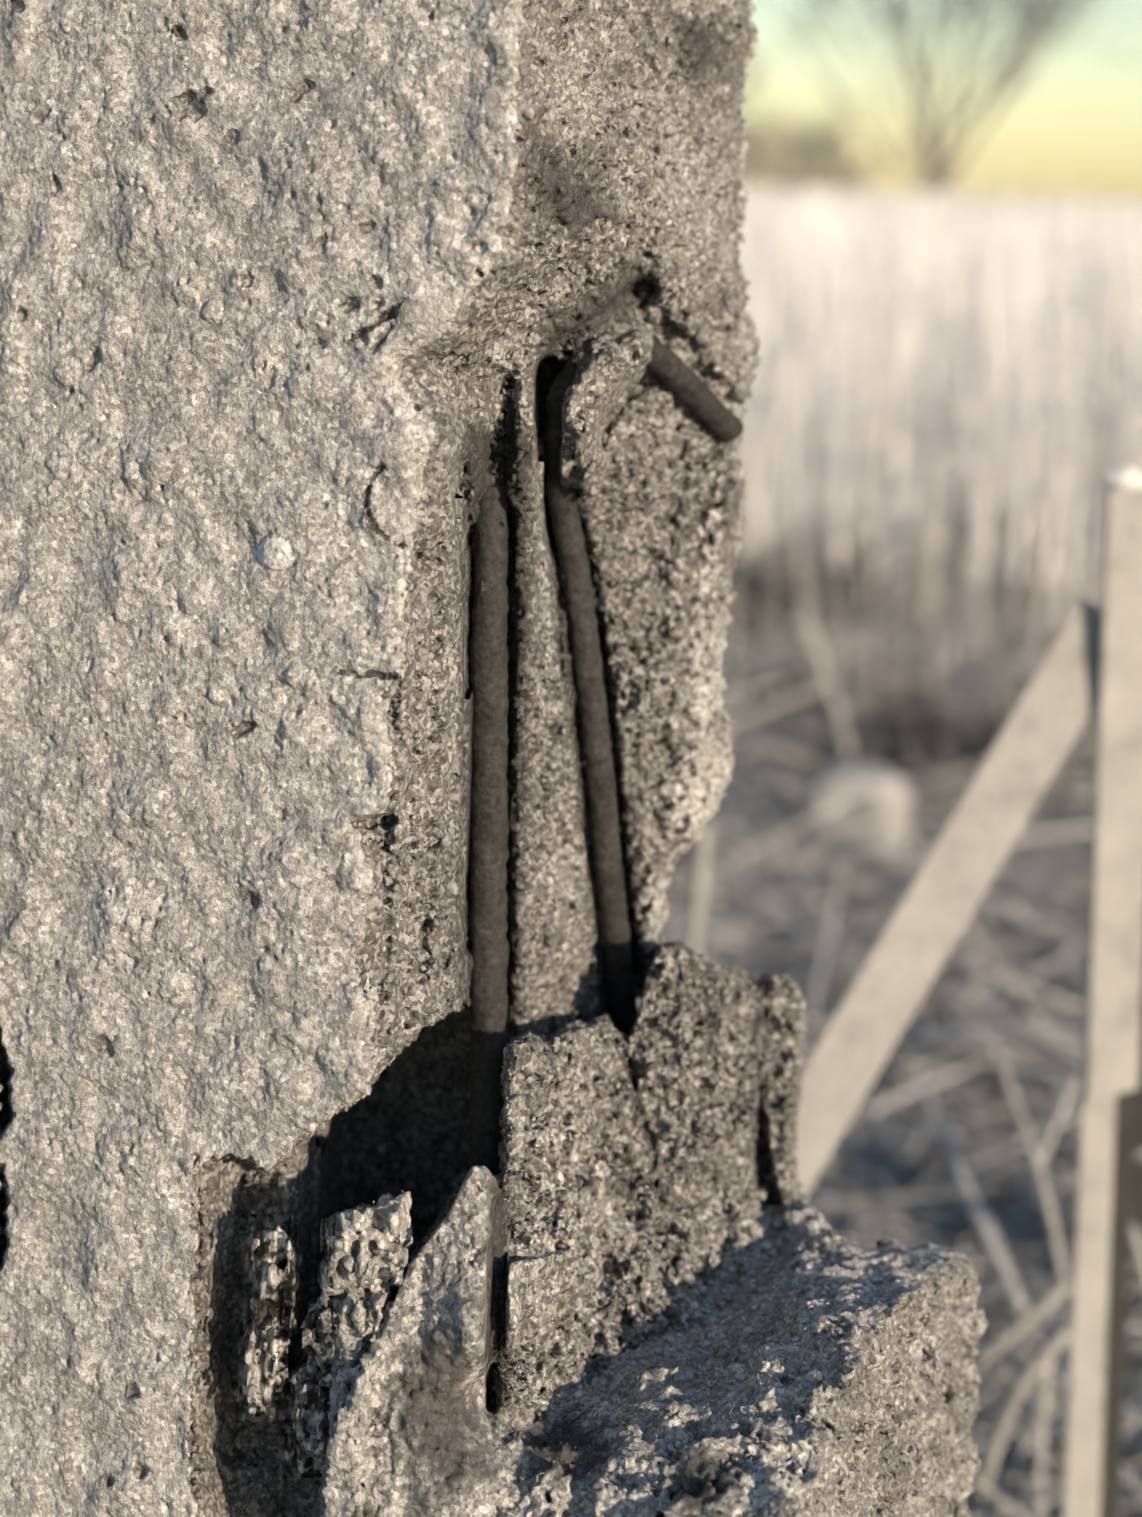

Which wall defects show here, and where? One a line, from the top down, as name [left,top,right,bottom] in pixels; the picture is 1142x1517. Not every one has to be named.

crack [0,1026,16,1280]
spalling [181,211,970,1517]